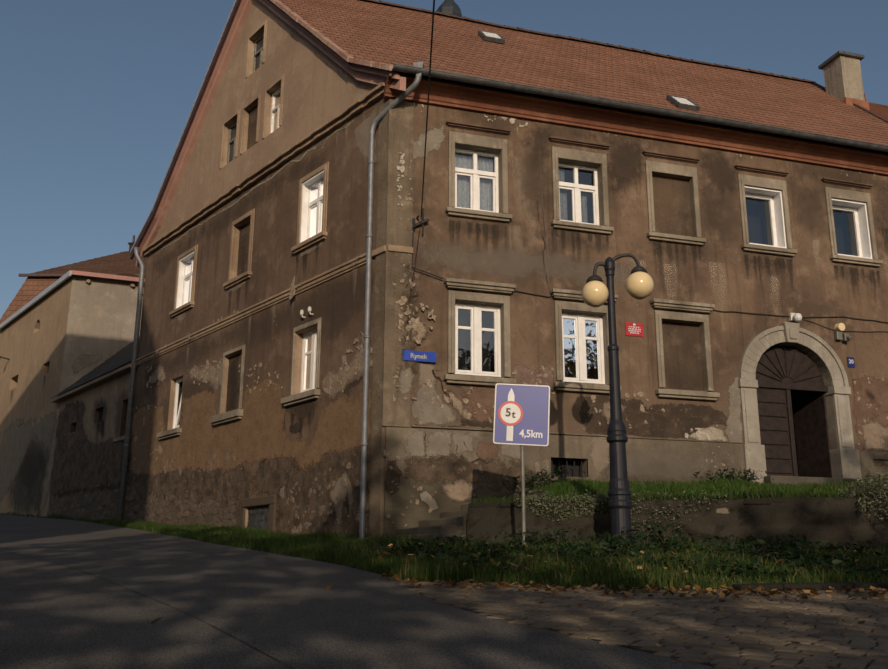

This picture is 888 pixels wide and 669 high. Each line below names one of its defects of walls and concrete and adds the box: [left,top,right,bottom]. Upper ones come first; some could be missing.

spalling [392,254,495,428]
damp [10,425,57,516]
spalling [47,329,373,539]
spalling [383,442,535,527]
spalling [579,394,610,435]
spalling [621,392,728,441]
flaking render [851,375,888,452]